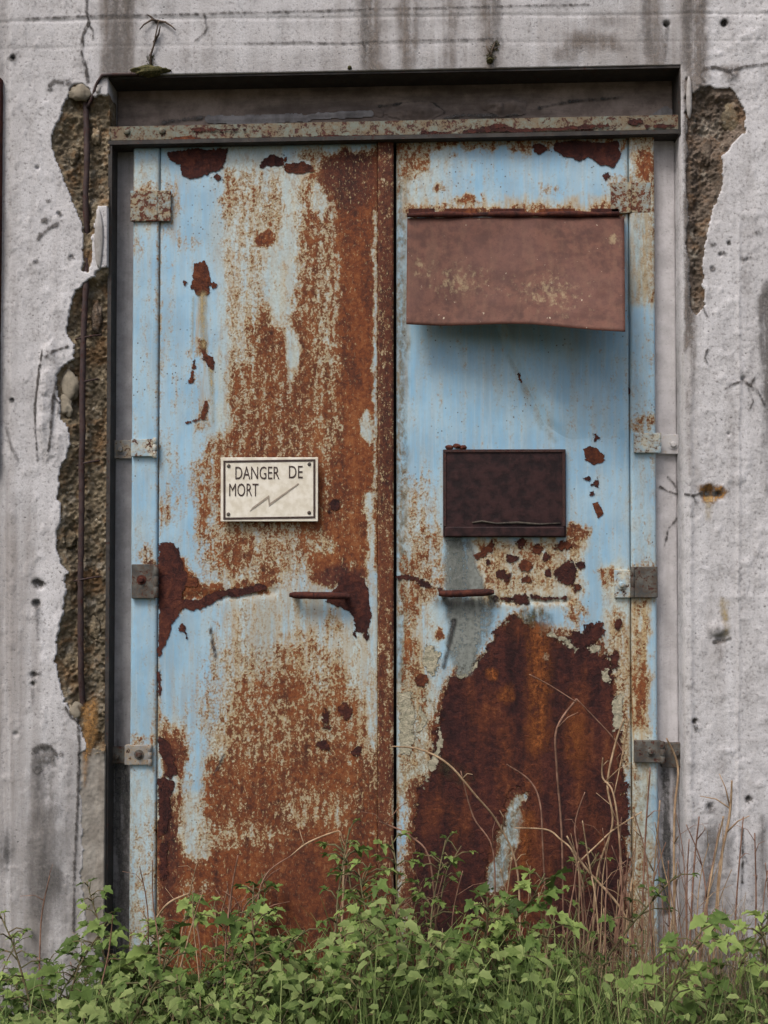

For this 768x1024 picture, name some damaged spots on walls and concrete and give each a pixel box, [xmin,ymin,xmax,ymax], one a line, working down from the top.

water stain [102,0,132,73]
water stain [362,0,381,70]
water stain [398,0,414,69]
water stain [569,32,616,49]
peeling [161,95,616,124]
spalling [36,213,61,241]
spalling [653,77,746,315]
corrosion [183,260,217,424]
spalling [47,79,116,946]
corrosion [315,702,353,751]
corrosion [406,538,632,979]
corrosion [157,737,177,884]